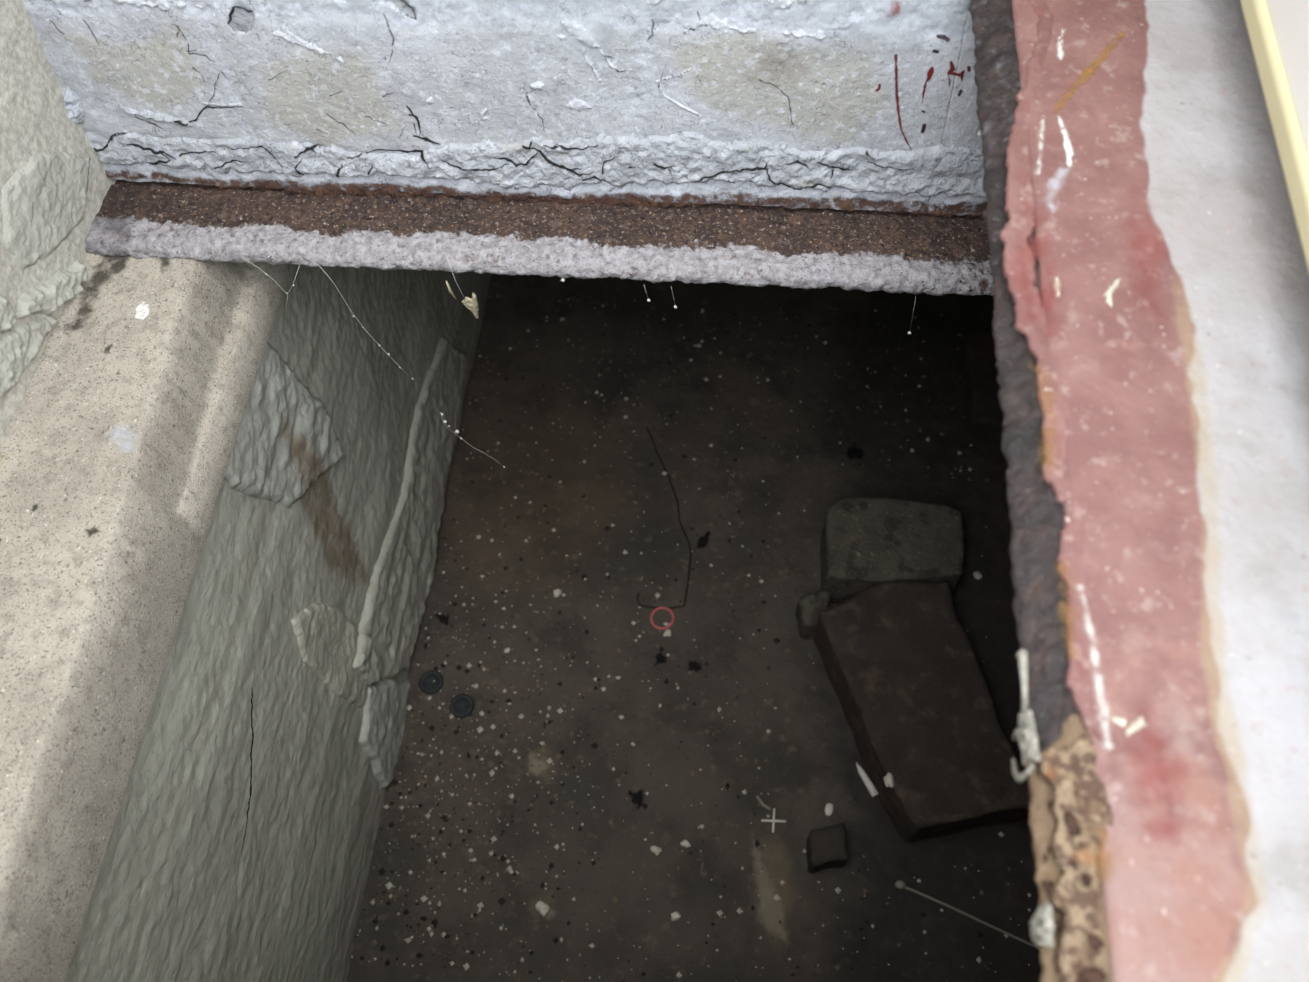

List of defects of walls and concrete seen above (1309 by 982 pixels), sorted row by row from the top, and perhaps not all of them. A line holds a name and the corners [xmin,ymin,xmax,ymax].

crack [135,25,235,130]
crack [316,91,439,144]
crack [759,79,793,125]
peeling [1,150,90,271]
peeling [0,261,89,398]